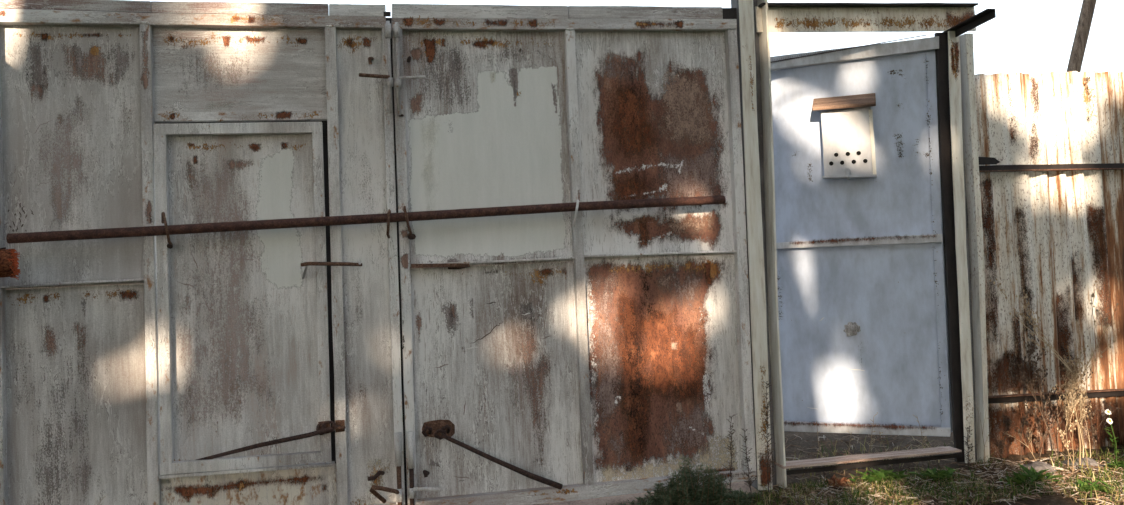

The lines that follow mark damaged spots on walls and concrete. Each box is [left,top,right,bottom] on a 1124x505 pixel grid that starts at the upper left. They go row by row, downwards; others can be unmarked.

corrosion [775,12,974,81]
corrosion [980,179,1120,458]